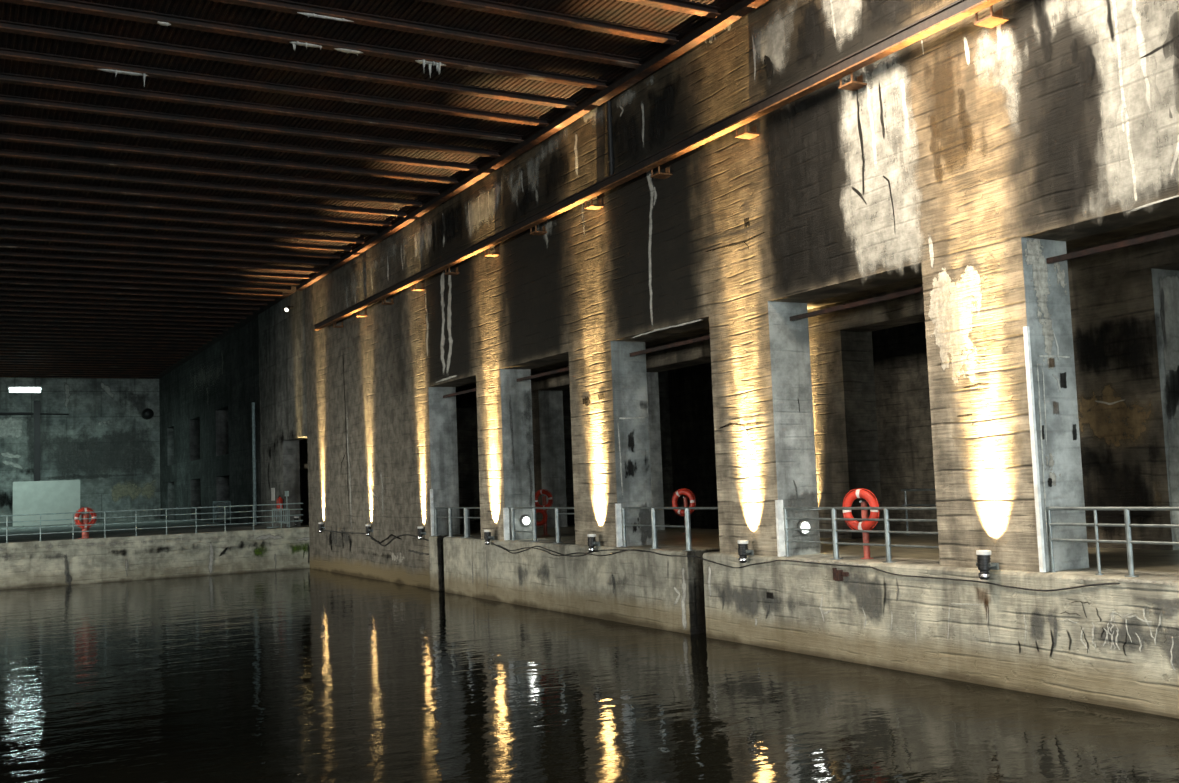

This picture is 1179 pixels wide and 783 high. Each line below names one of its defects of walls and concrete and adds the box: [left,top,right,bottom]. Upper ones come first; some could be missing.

leakage [425,272,456,382]
leakage [346,131,578,308]
leakage [581,76,680,163]
leakage [635,170,700,337]
leakage [767,56,921,288]
leakage [1034,0,1179,220]
leakage [1074,275,1179,542]